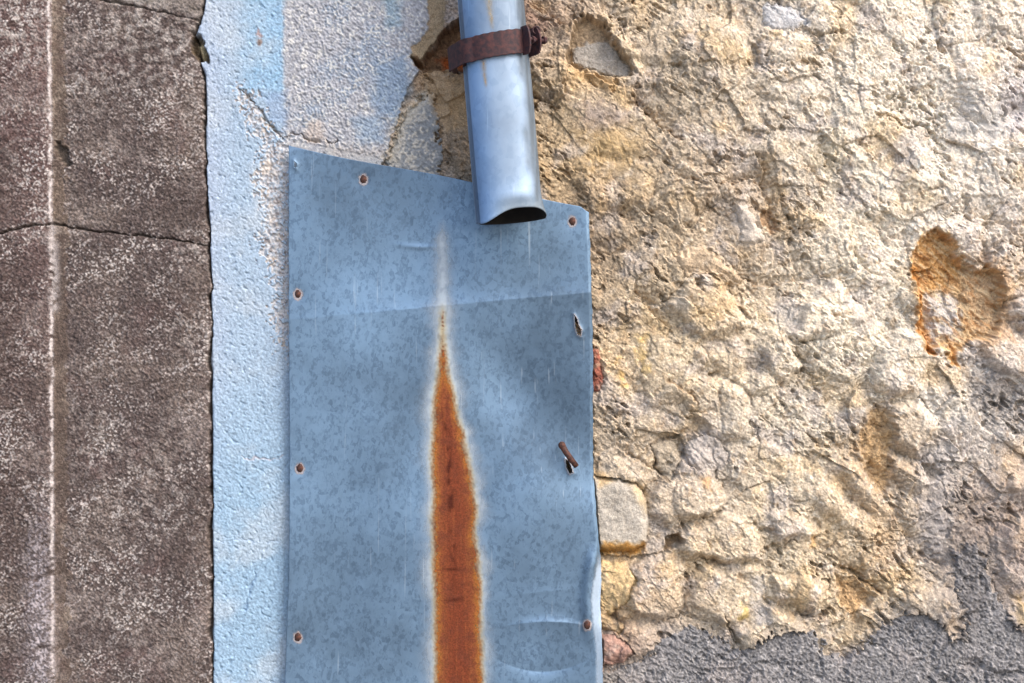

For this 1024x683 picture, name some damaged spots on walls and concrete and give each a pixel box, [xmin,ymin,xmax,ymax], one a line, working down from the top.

flaking render [763,2,809,32]
flaking render [569,38,634,78]
flaking render [737,205,765,245]
flaking render [673,245,743,286]
crack [0,0,284,683]
flaking render [923,292,962,342]
rust [426,232,488,683]
flaking render [651,435,730,481]
spalling [852,405,900,497]
flaking render [593,475,650,636]